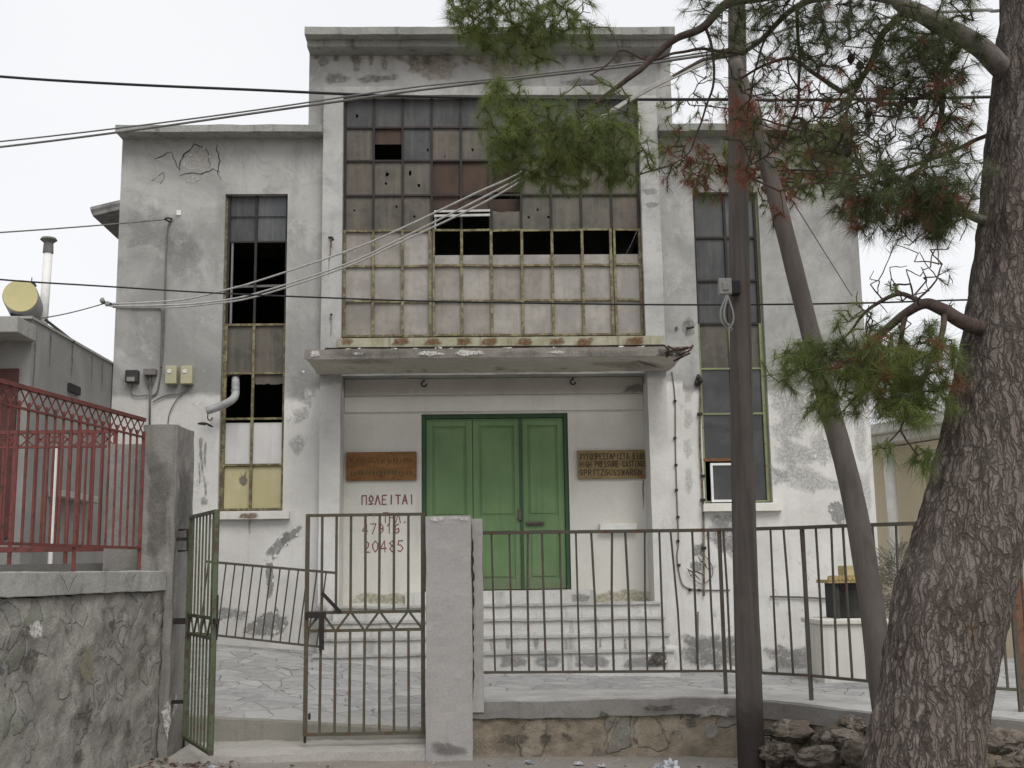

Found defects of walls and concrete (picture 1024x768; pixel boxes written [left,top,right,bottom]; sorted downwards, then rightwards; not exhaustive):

crack [152,144,221,184]
flaking render [218,526,302,638]